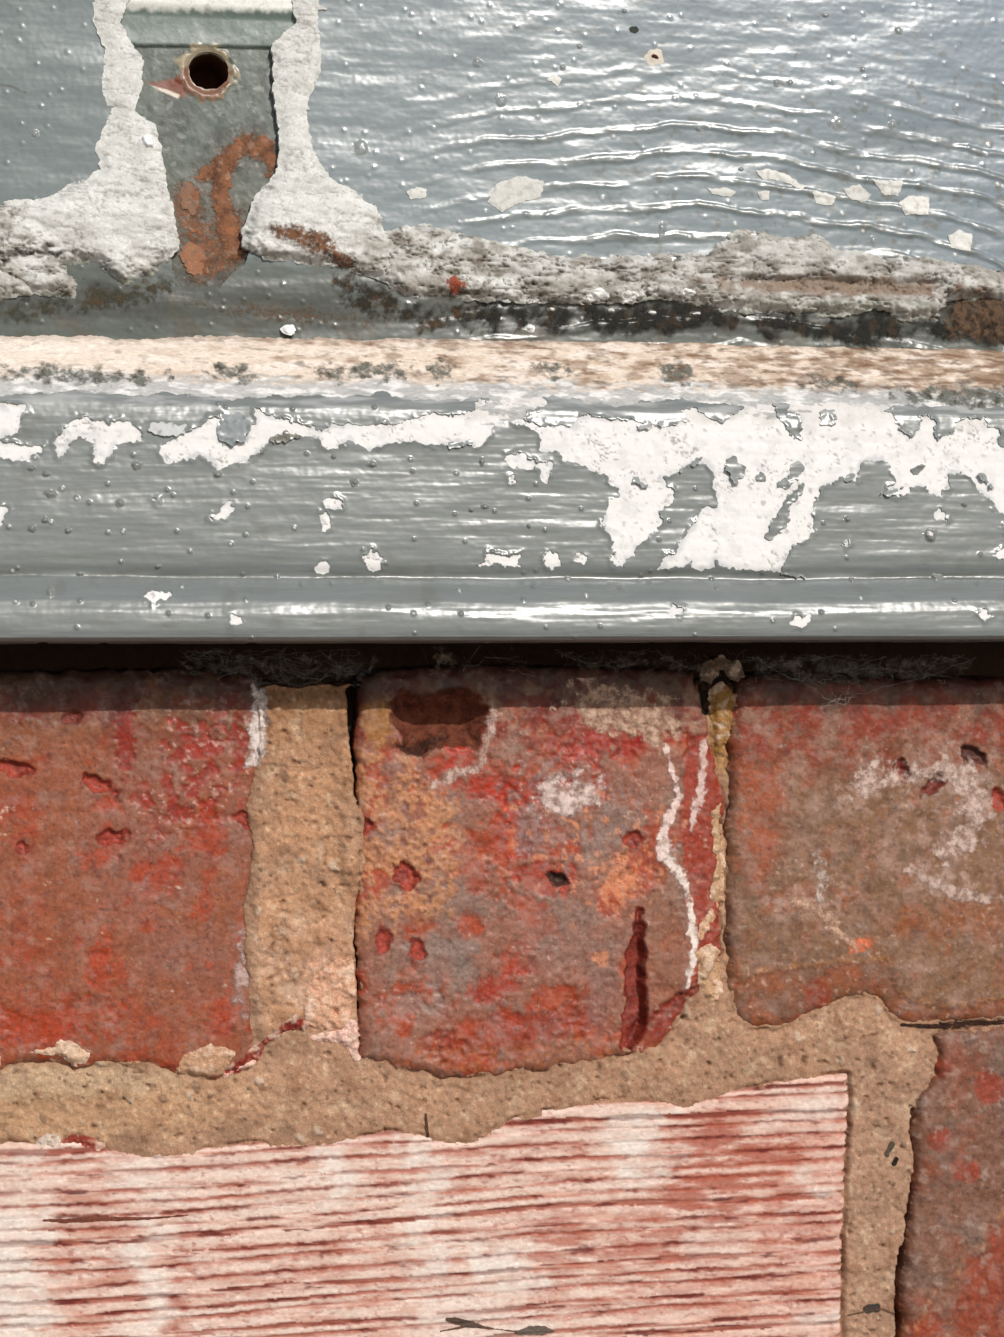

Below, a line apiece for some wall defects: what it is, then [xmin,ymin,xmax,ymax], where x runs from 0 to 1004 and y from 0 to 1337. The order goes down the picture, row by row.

corrosion [172,132,278,284]
peeling [407,187,427,199]
peeling [488,176,544,212]
peeling [756,169,929,216]
peeling [948,230,972,251]
leakage [455,296,1004,349]
peeling [0,395,1004,579]
crack [346,686,359,805]
leakage [550,678,708,989]
spalling [619,906,649,1053]
crack [884,1141,899,1166]
crack [847,1303,896,1317]